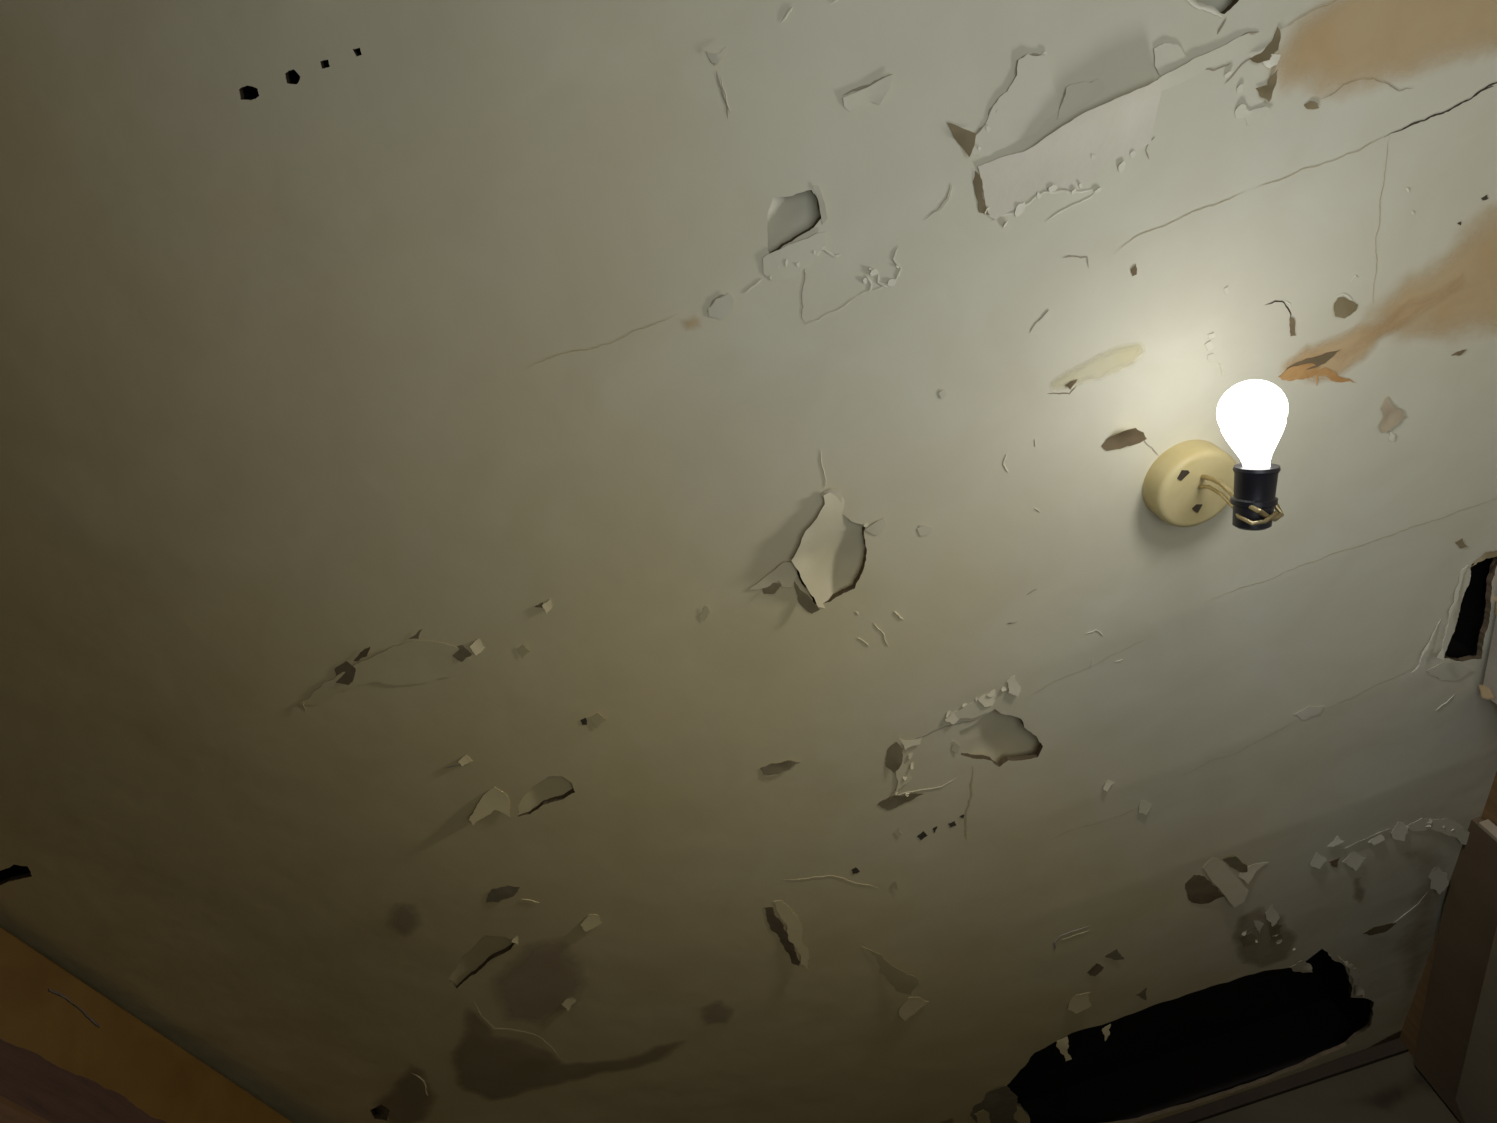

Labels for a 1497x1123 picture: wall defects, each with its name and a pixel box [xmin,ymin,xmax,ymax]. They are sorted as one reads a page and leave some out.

leakage [1285,0,1497,81]
peeling [947,0,1281,228]
flaking render [744,186,841,293]
crack [1063,78,1497,302]
leakage [1289,220,1497,379]
peeling [749,449,887,614]
spalling [1445,538,1497,658]
flaking render [878,675,1040,811]
peeling [763,900,810,971]
peeling [1185,856,1268,907]
peeling [1310,818,1470,871]
spalling [1007,905,1369,1123]